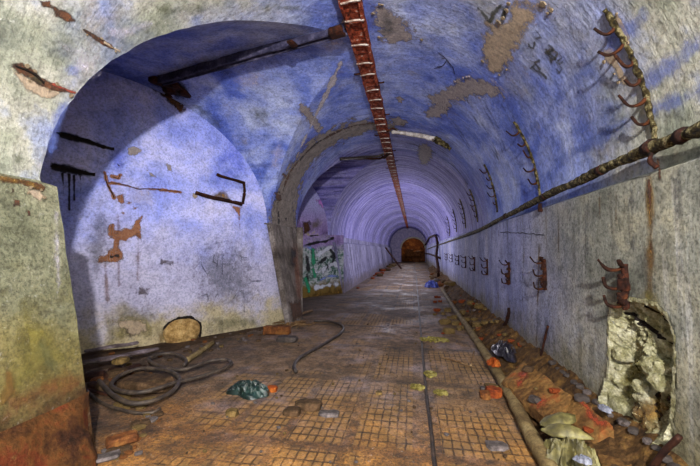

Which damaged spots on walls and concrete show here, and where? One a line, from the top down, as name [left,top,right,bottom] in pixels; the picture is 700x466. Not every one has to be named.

flaking render [83,29,120,53]
flaking render [371,3,424,44]
flaking render [480,0,554,76]
flaking render [11,62,76,98]
spalling [298,61,342,154]
flaking render [424,75,506,118]
corrosion [646,180,654,227]
flaking render [98,194,143,263]
spalling [598,296,677,446]